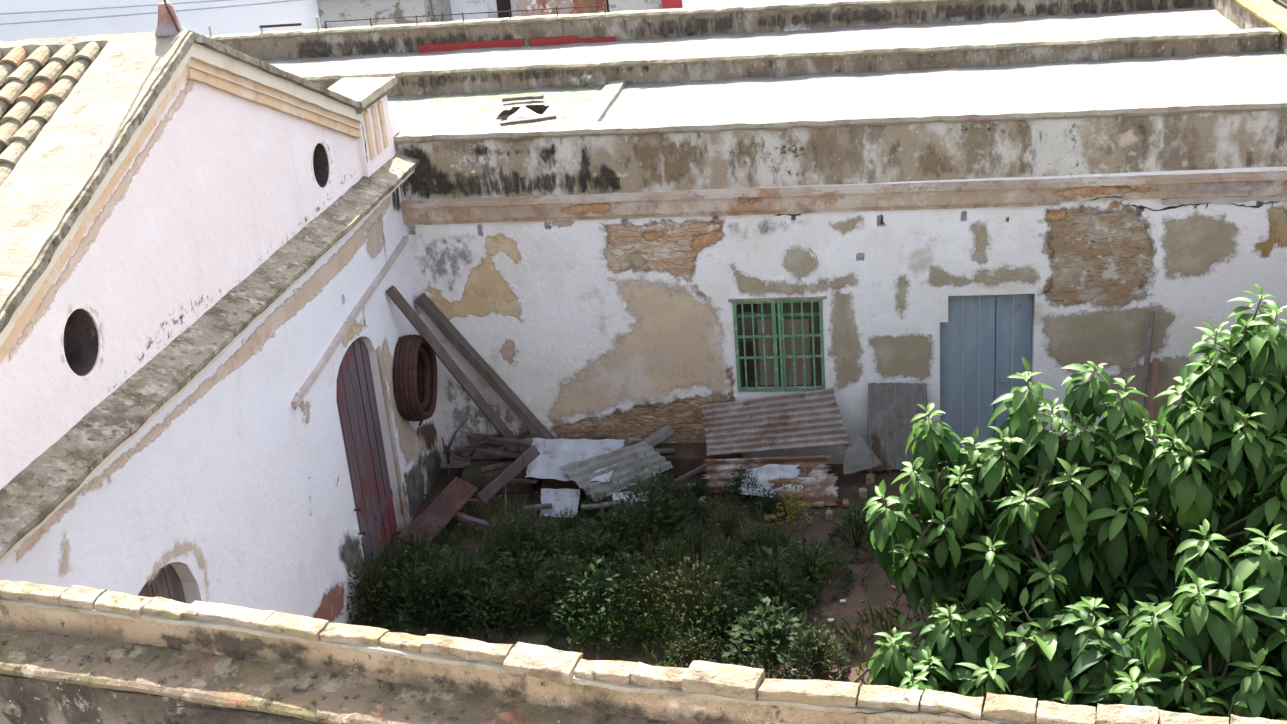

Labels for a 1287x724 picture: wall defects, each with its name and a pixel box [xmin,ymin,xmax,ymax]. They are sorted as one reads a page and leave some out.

leakage [644,13,733,37]
leakage [759,0,1195,31]
leakage [298,34,513,58]
leakage [392,144,620,210]
peeling [422,233,524,321]
spalling [929,185,1239,427]
peeling [545,202,735,448]
spalling [500,337,520,366]
spalling [314,528,367,621]
mould [432,677,520,698]
mould [587,700,644,717]
mould [694,716,725,724]